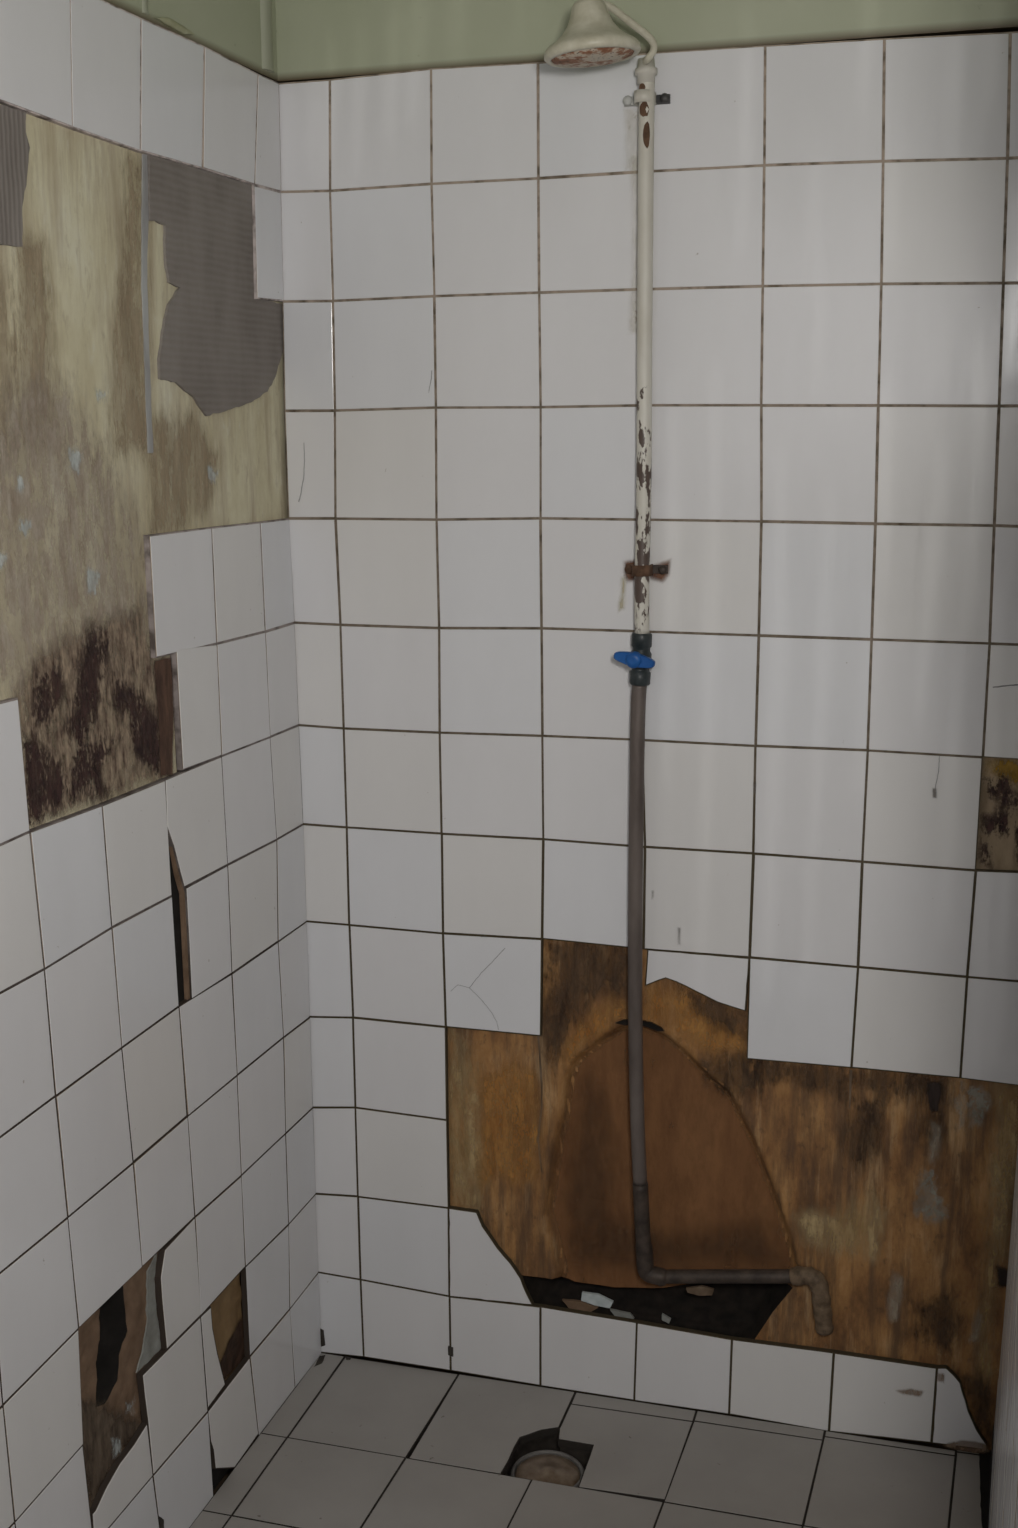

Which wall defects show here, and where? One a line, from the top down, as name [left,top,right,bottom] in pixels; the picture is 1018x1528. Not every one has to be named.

rust [639,83,650,148]
peeling [0,104,288,829]
rust [620,561,669,608]
peeling [976,757,1018,870]
spalling [169,847,190,1000]
spalling [448,939,1018,1528]
spalling [78,1251,161,1507]
spalling [210,1274,245,1380]
spalling [211,1468,229,1491]